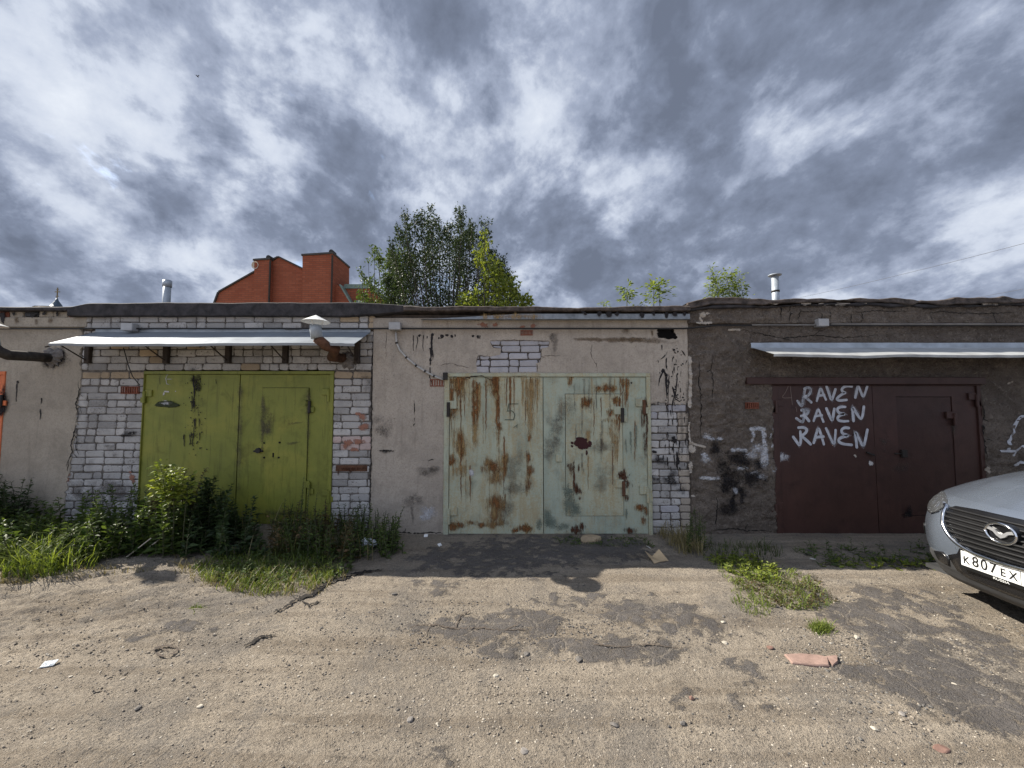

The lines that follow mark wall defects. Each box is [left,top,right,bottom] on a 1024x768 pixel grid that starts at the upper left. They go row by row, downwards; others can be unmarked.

flaking render [476,323,550,373]
spalling [657,329,678,339]
crack [747,306,1012,341]
corrosion [449,377,540,533]
corrosion [568,378,648,534]